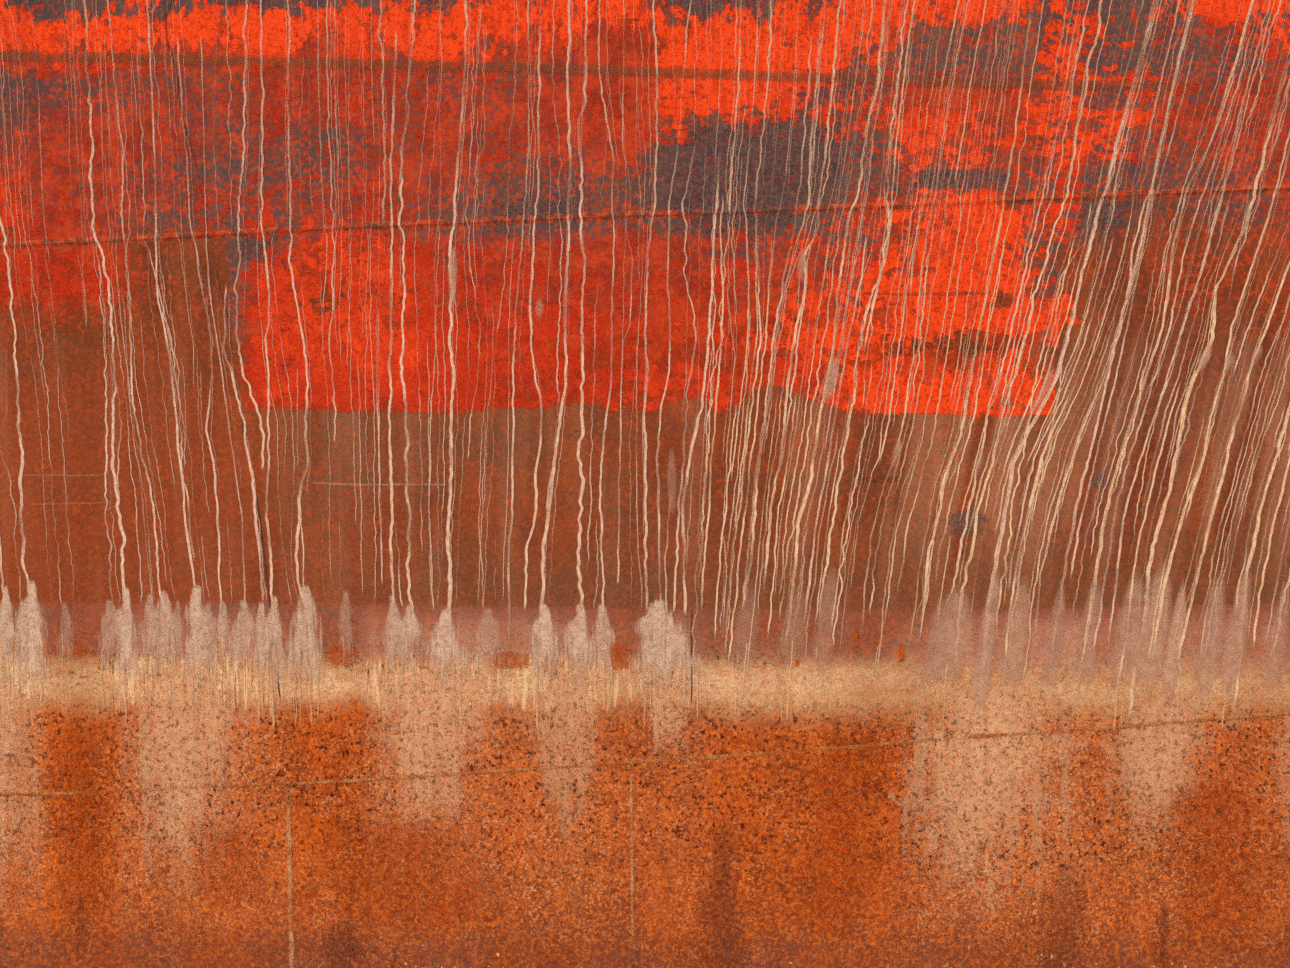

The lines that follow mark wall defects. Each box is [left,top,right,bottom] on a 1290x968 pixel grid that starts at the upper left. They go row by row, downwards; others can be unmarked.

damp [243,0,263,48]
damp [0,218,21,381]
damp [0,408,47,905]
damp [30,259,65,478]
damp [88,19,322,884]
damp [323,78,509,829]
damp [497,0,1290,914]